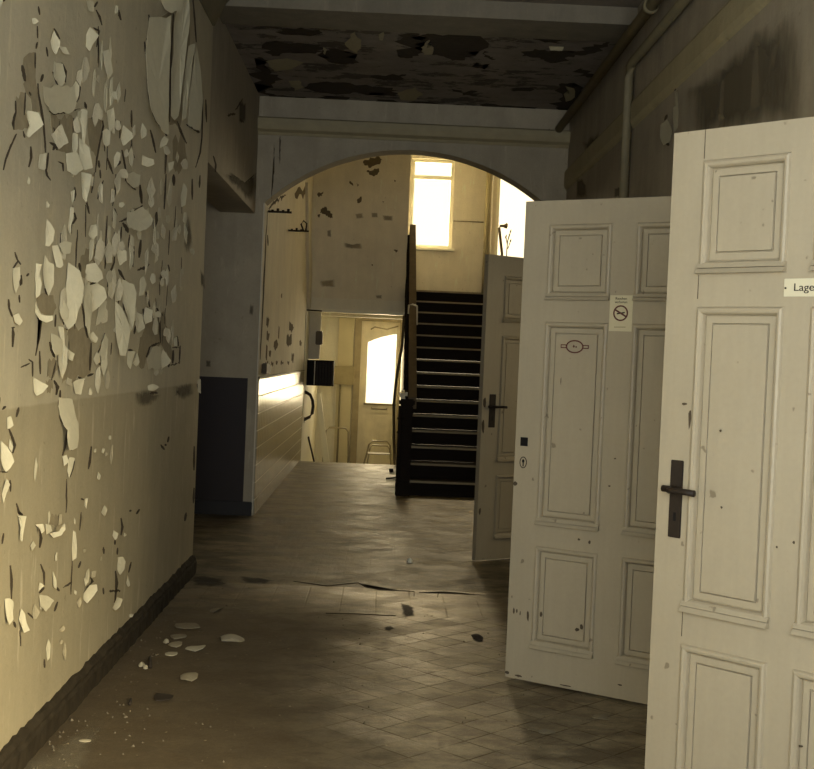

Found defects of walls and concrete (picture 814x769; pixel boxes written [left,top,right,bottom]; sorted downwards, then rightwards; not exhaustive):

flaking render [249,28,444,105]
flaking render [395,33,495,69]
flaking render [522,39,610,63]
flaking render [549,68,594,110]
flaking render [363,156,382,176]
flaking render [260,187,305,367]
peeling [0,406,19,504]
crack [294,581,483,598]
crack [329,610,395,618]
peeling [43,625,66,668]